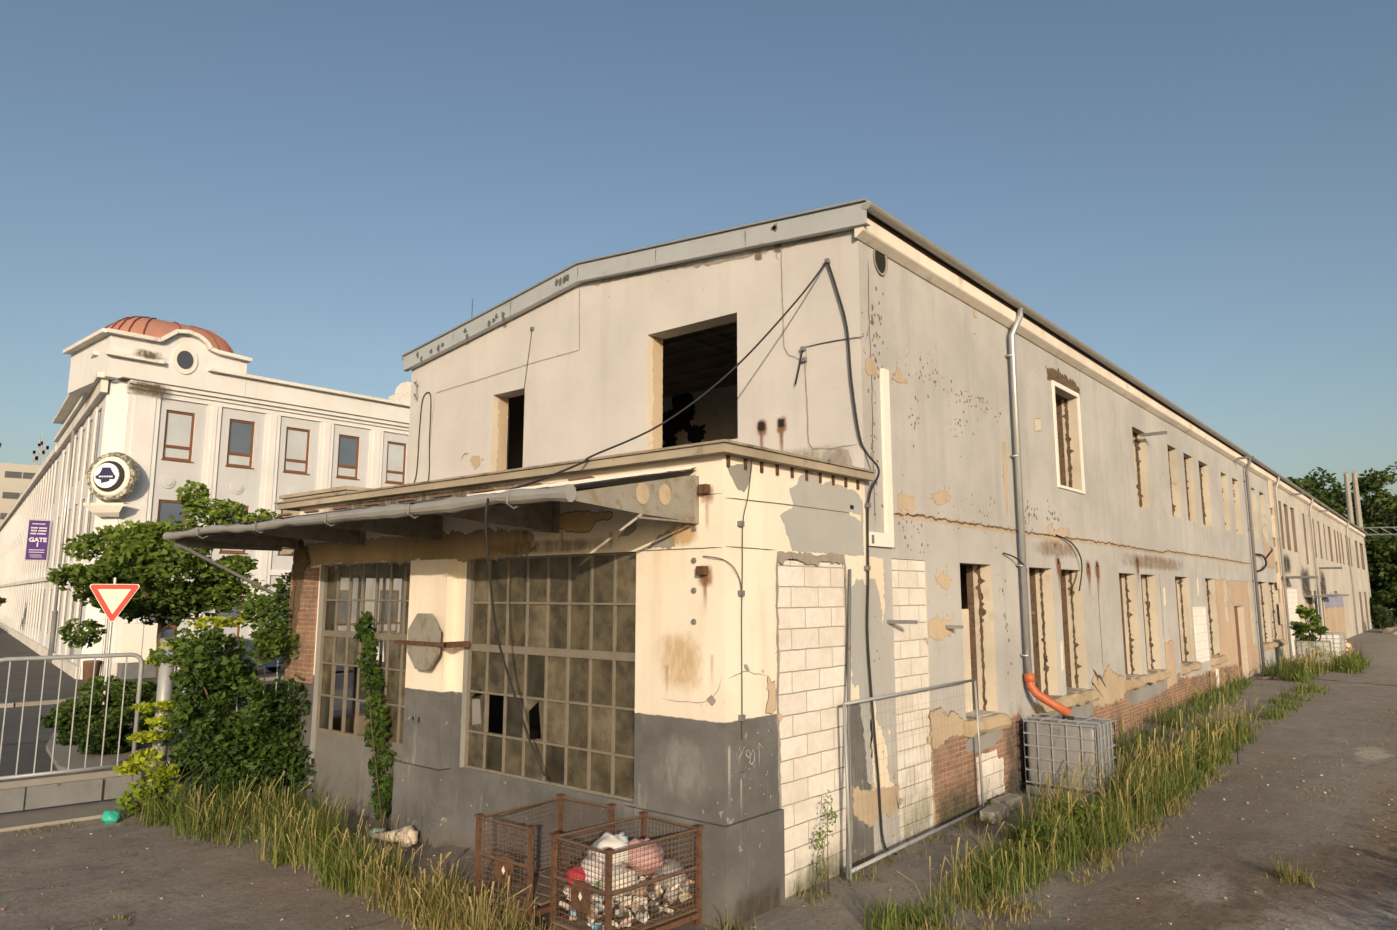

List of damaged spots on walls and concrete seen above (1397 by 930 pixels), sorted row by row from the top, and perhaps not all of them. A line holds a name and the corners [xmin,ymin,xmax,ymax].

rust [758,418,786,446]
peeling [863,287,1001,447]
peeling [780,422,954,828]
flaking render [1052,579,1277,739]
flaking render [926,707,1025,829]